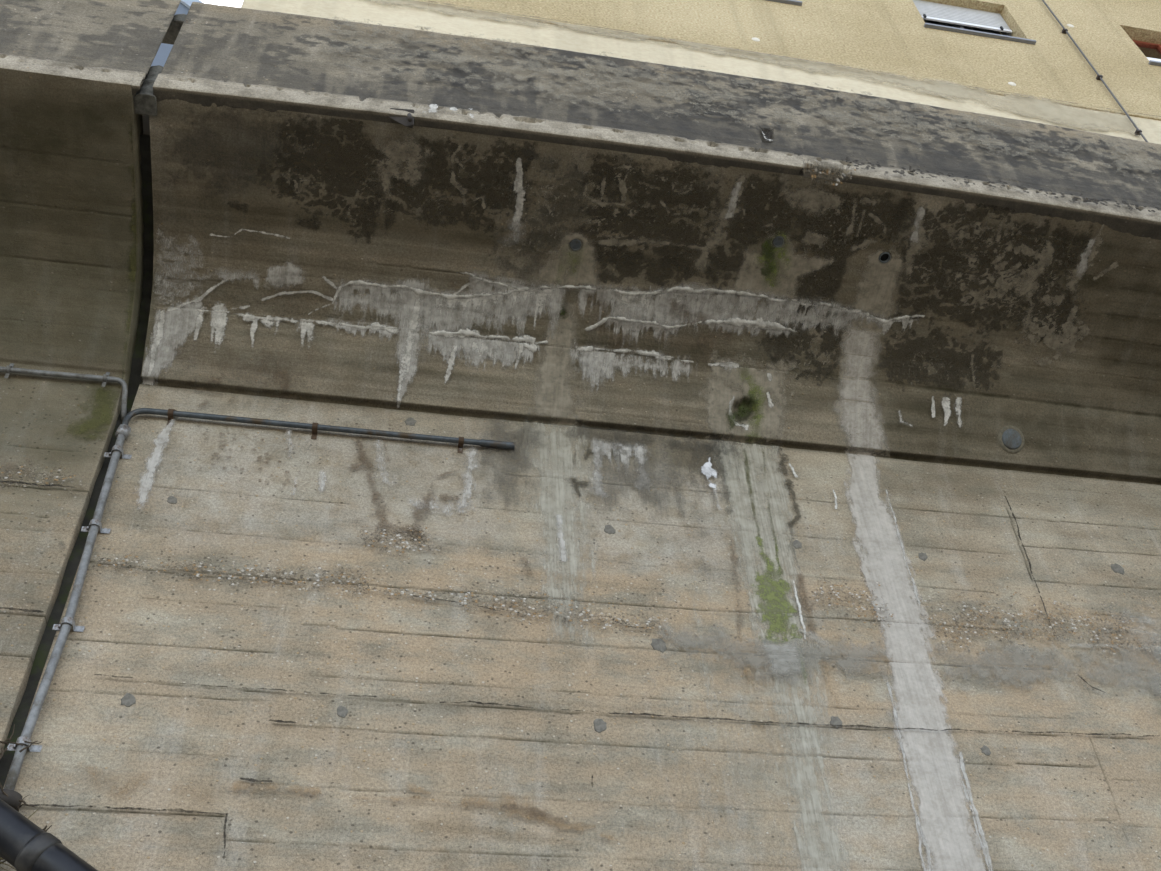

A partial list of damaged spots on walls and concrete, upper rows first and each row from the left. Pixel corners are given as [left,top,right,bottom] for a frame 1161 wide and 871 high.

water stain [512,158,525,241]
water stain [695,175,746,271]
water stain [138,204,993,871]
crack [1005,496,1058,639]